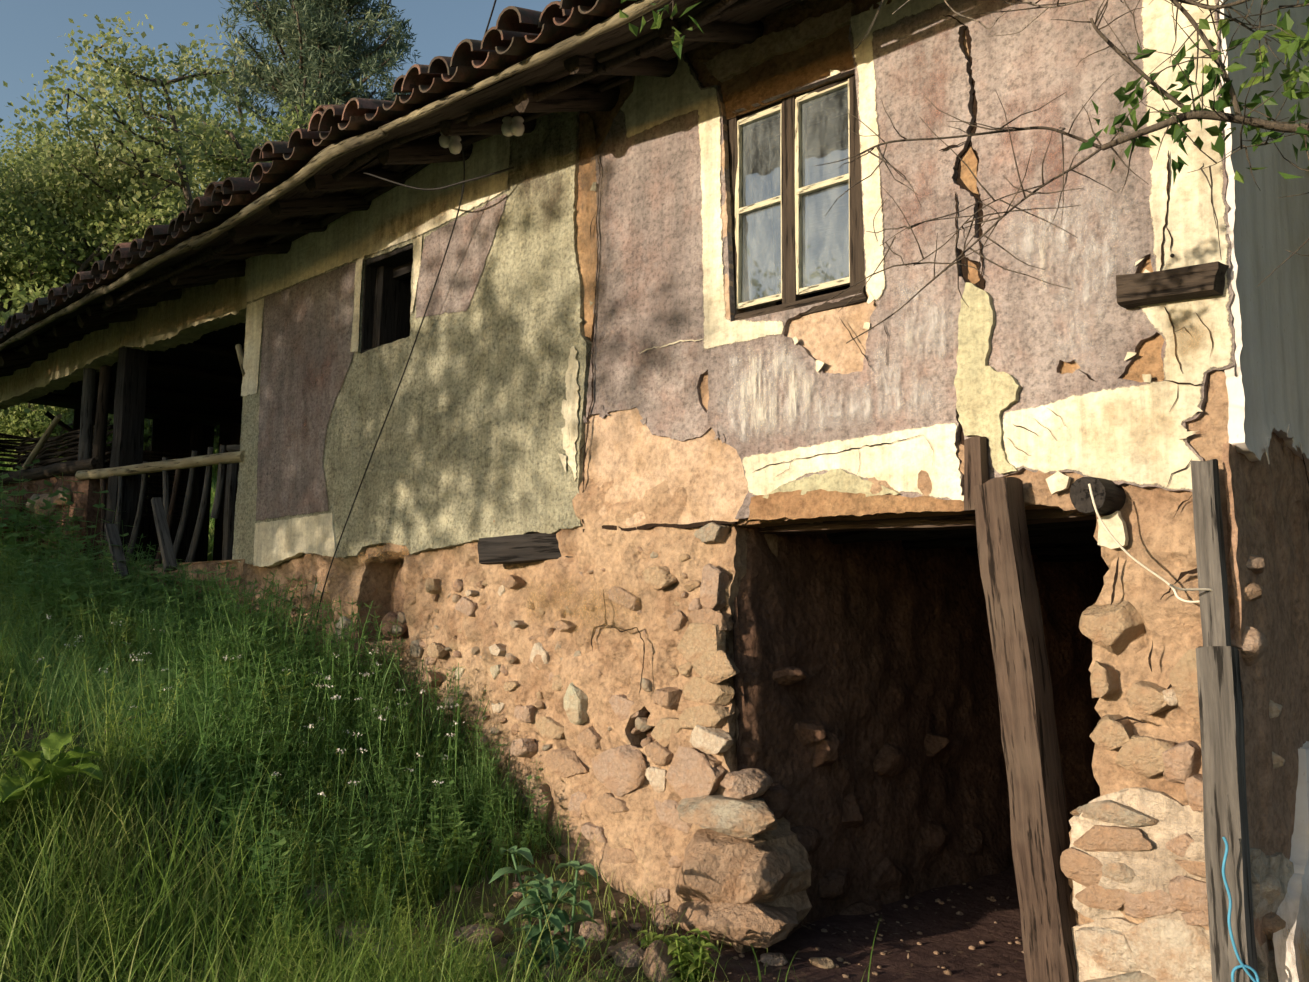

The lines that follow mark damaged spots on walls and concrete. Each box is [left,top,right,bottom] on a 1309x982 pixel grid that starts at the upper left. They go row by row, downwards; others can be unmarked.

peeling [687,0,892,120]
crack [939,15,986,290]
crack [1160,150,1173,271]
crack [579,155,737,532]
peeling [787,291,877,375]
spalling [1121,334,1164,383]
crack [1164,306,1213,411]
crack [591,589,645,693]